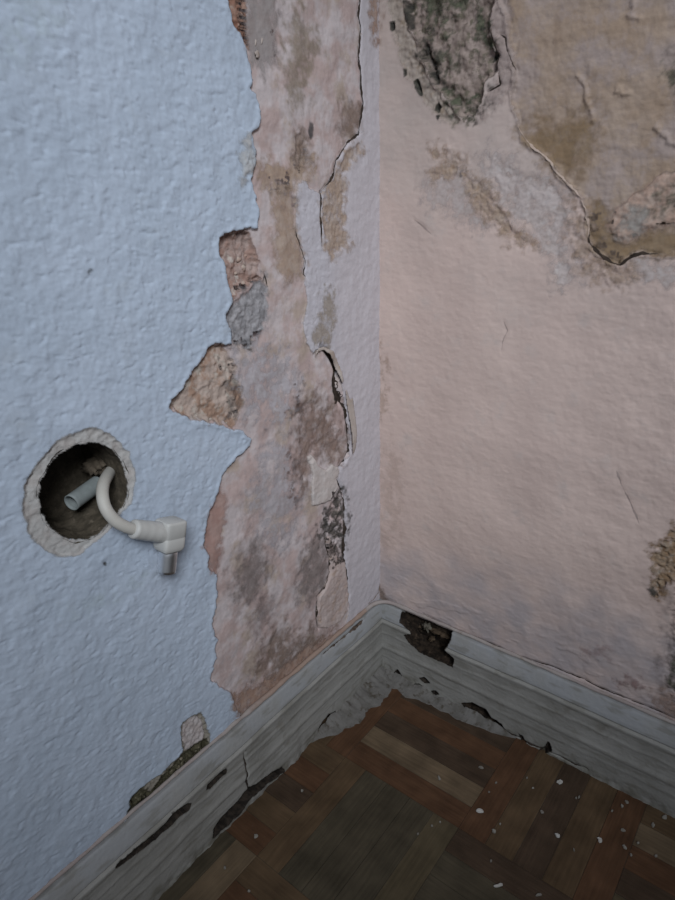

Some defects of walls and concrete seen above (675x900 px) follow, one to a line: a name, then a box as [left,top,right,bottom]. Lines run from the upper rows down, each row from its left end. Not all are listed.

water stain [388,0,460,125]
crack [295,0,364,277]
peeling [403,0,675,265]
spalling [219,230,261,300]
spalling [169,344,244,427]
water stain [226,276,352,603]
crack [315,350,354,627]
water stain [256,628,319,680]
peeling [312,666,524,742]
spalling [399,612,454,667]
spalling [127,713,211,819]
crack [115,755,248,869]